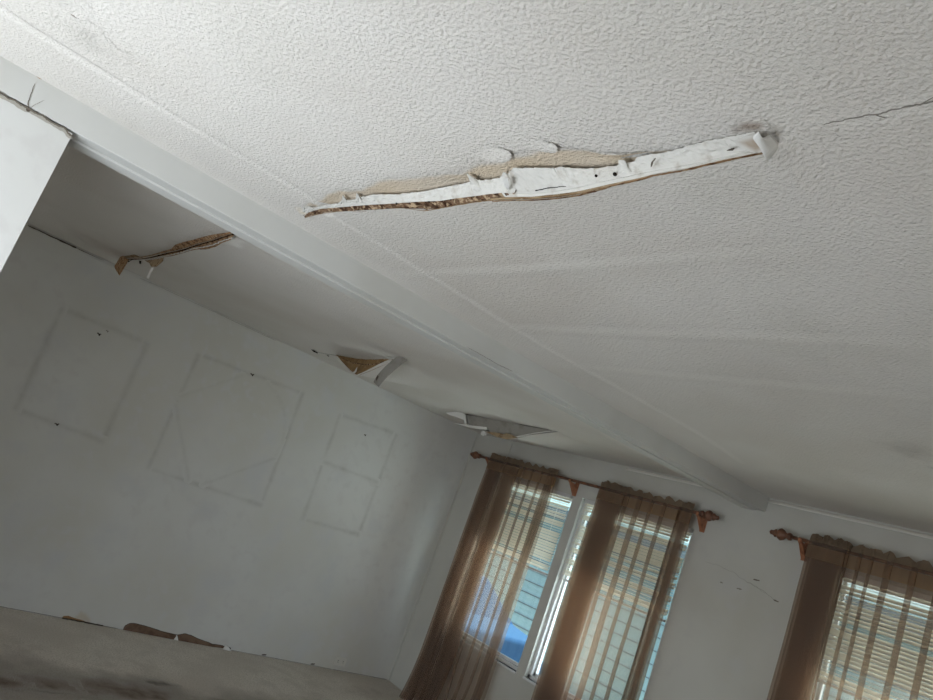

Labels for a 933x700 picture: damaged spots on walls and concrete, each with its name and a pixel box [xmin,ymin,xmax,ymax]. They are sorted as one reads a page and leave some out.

crack [0,84,73,139]
peeling [446,412,487,430]